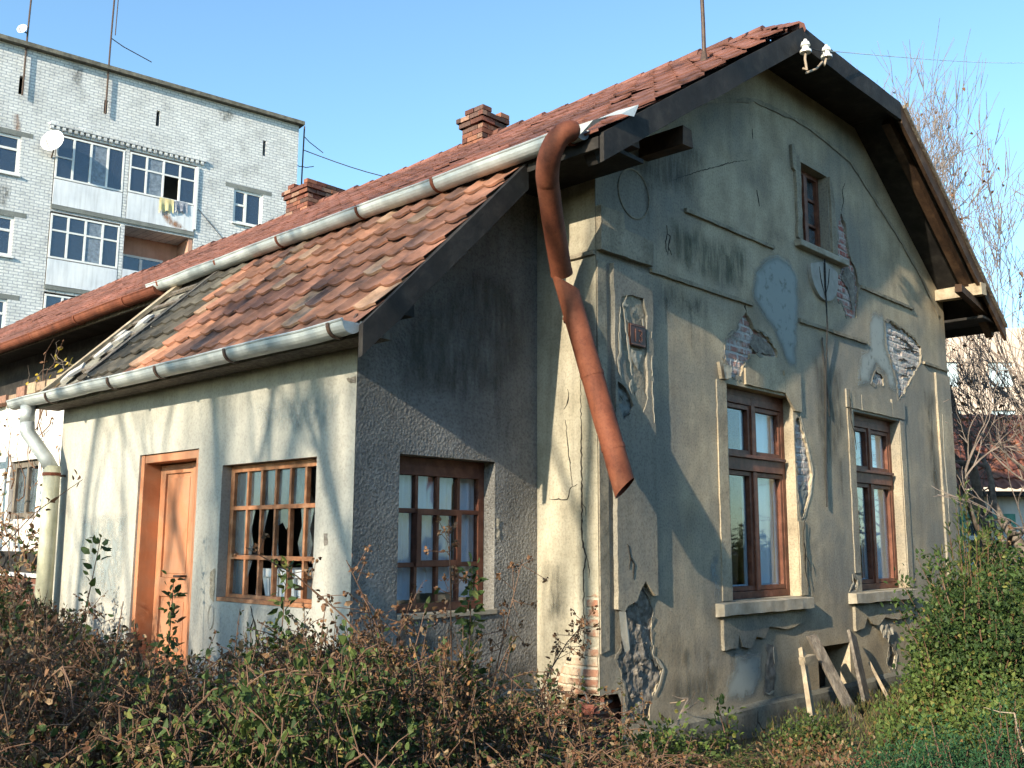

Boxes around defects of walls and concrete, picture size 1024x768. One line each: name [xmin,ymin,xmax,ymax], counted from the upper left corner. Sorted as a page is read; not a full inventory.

flaking render [833,216,860,319]
flaking render [617,295,655,423]
flaking render [722,304,776,382]
flaking render [870,318,922,401]
crack [551,380,590,643]
flaking render [795,413,814,523]
flaking render [555,588,664,721]
flaking render [880,624,898,673]